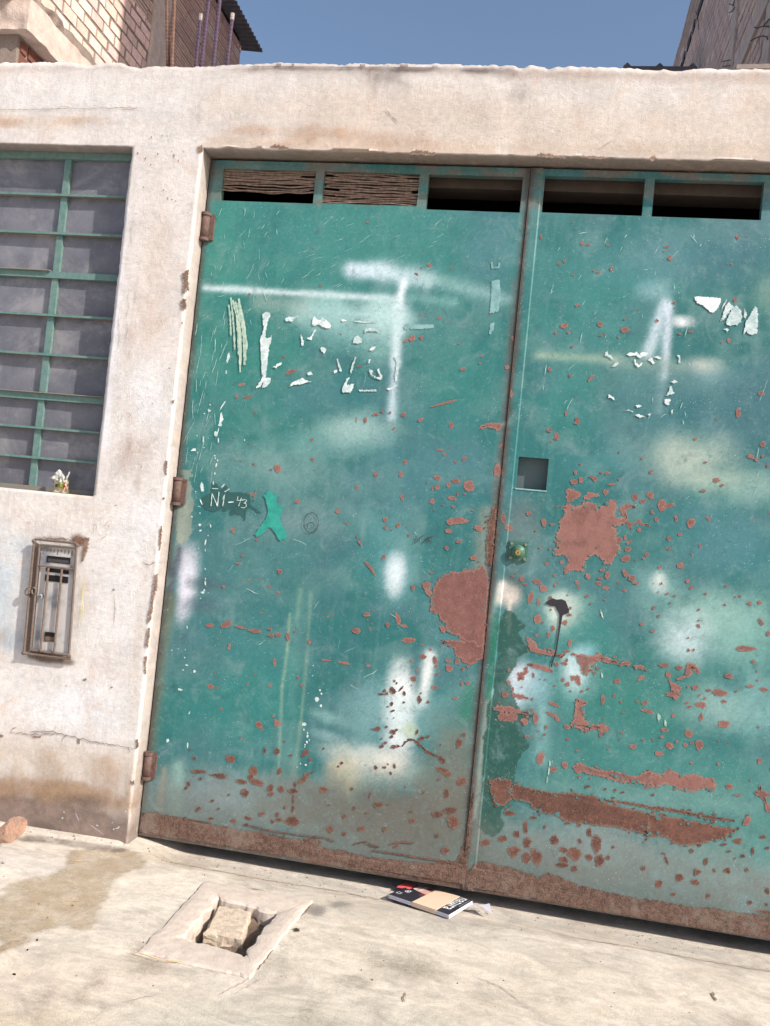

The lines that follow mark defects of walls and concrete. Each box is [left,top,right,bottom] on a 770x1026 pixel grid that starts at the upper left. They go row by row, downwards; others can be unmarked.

corrosion [422,505,498,685]
corrosion [527,471,696,592]
crack [11,728,136,752]
corrosion [139,620,770,939]
damp [0,782,145,942]